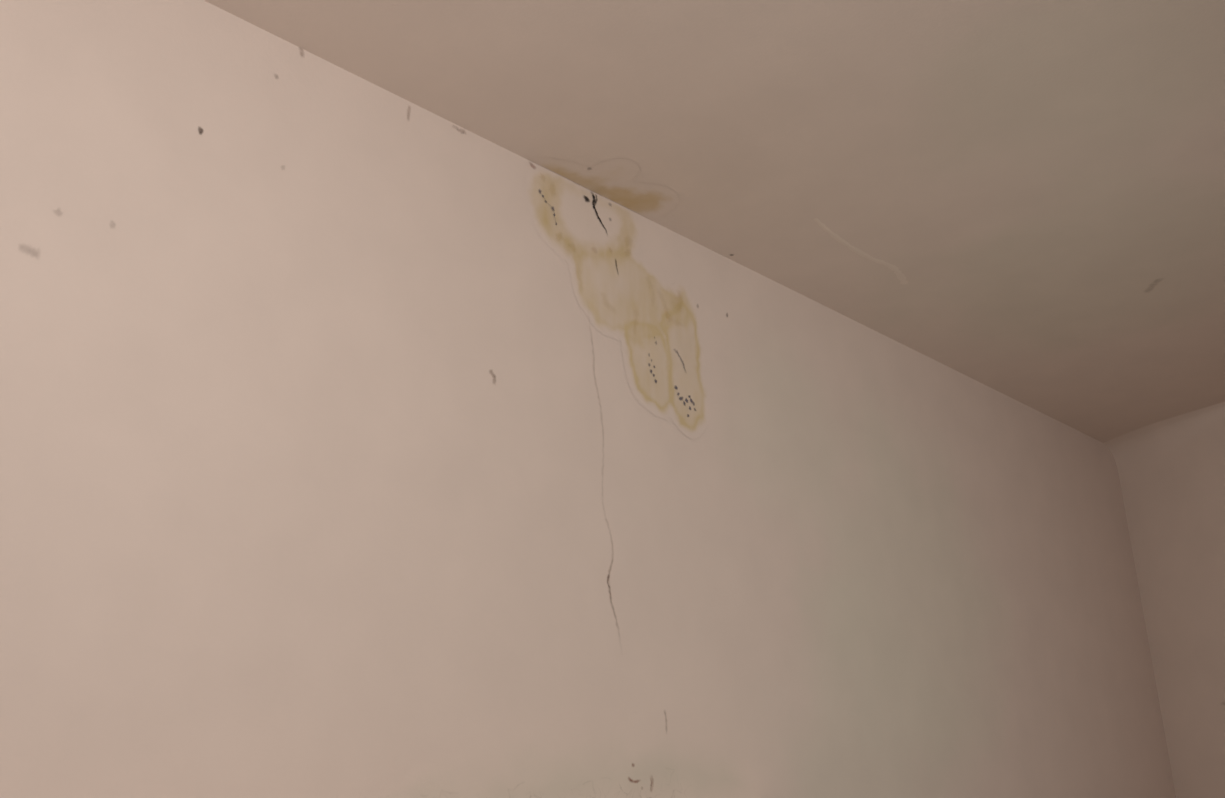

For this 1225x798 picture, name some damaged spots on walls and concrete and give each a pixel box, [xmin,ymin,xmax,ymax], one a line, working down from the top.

water stain [525,157,711,440]